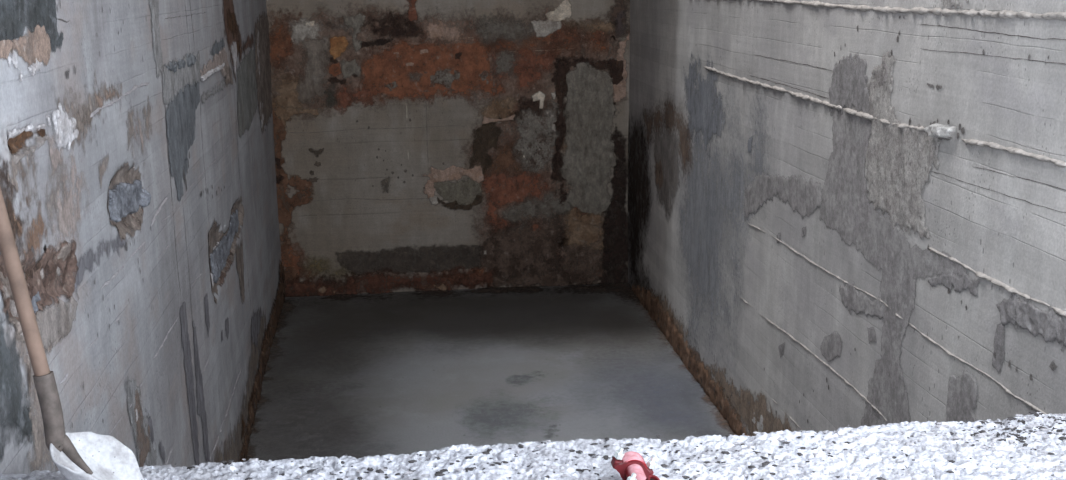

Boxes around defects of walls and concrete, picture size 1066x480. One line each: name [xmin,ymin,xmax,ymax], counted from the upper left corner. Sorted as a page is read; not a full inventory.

peeling [0,25,51,82]
flaking render [324,20,352,106]
spalling [17,240,79,324]
damp [279,116,652,369]
peeling [0,255,58,471]
damp [250,398,356,461]